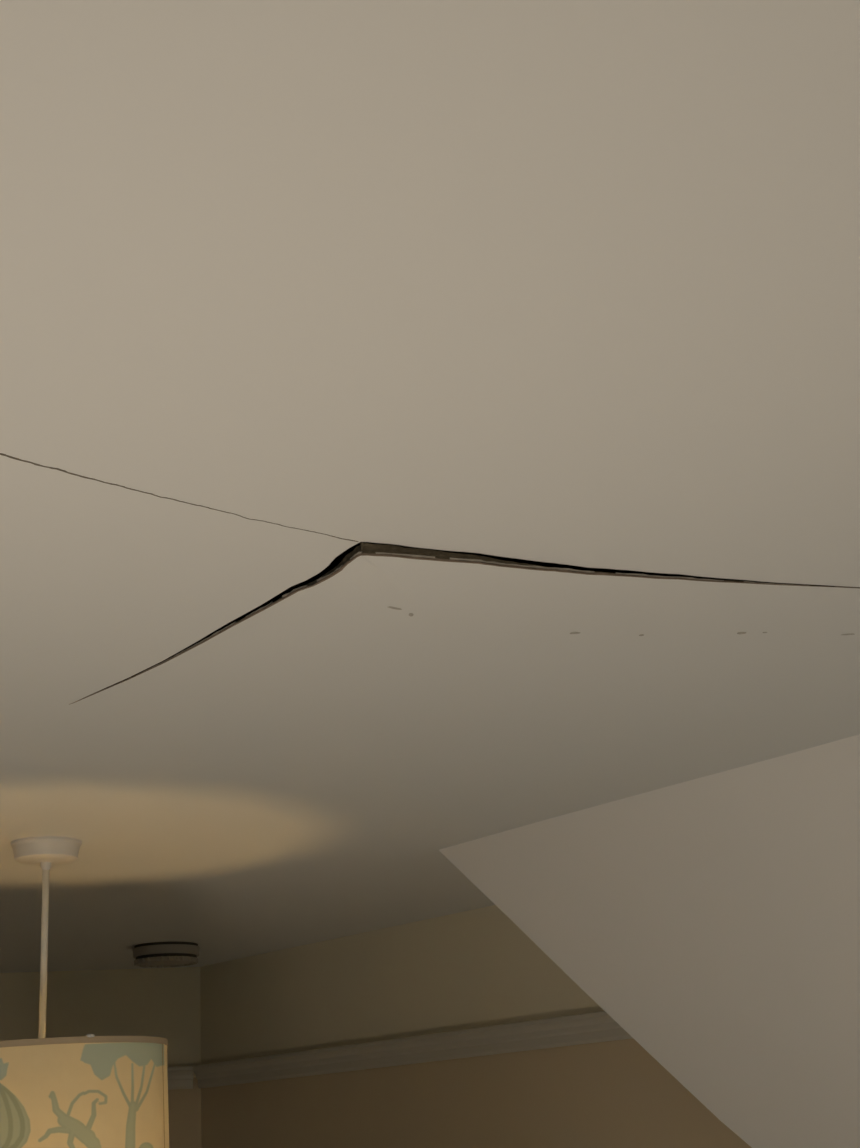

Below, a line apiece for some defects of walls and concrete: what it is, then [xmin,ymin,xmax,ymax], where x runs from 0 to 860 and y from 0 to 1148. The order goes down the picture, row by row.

crack [0,453,857,704]